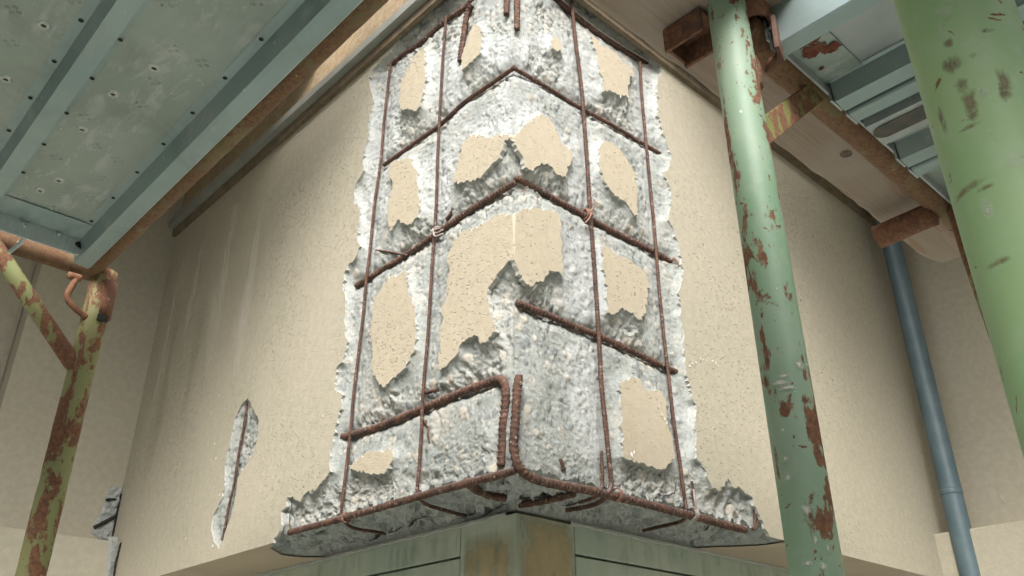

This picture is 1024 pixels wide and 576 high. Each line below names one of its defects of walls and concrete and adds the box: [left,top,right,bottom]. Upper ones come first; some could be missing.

rust [799,37,842,70]
spalling [270,0,784,557]
spalling [91,484,123,576]
spalling [212,400,259,547]